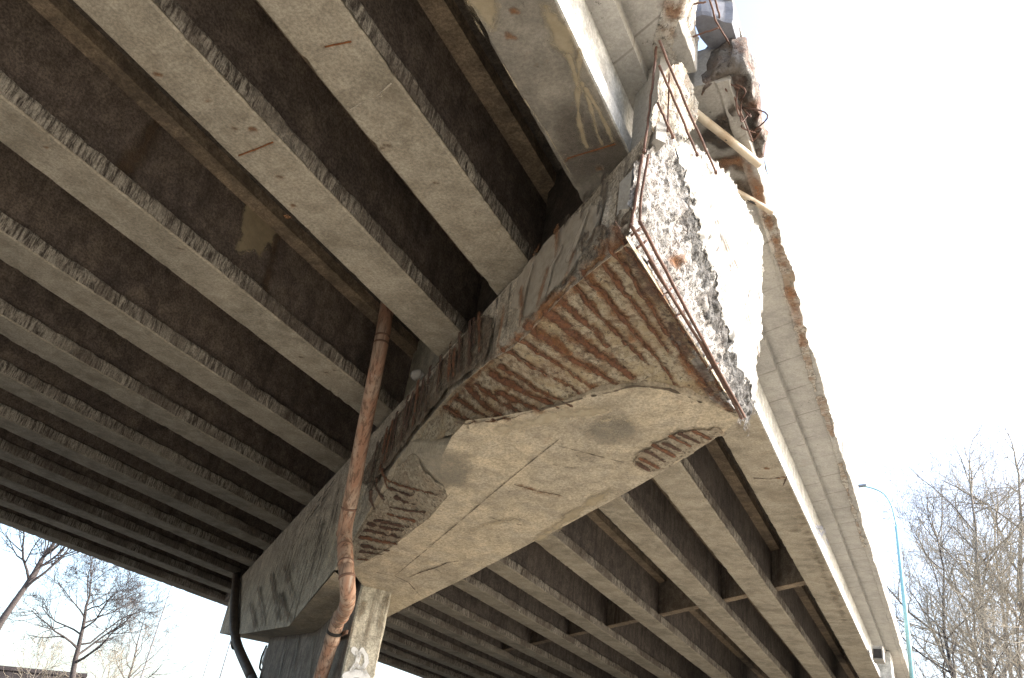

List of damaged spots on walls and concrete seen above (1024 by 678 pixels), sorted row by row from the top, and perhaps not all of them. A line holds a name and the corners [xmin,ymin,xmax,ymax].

water stain [468,0,497,28]
water stain [543,5,623,214]
water stain [236,205,280,292]
spalling [353,0,801,561]
spalling [793,324,835,437]
crack [377,440,616,593]
spalling [837,463,867,547]